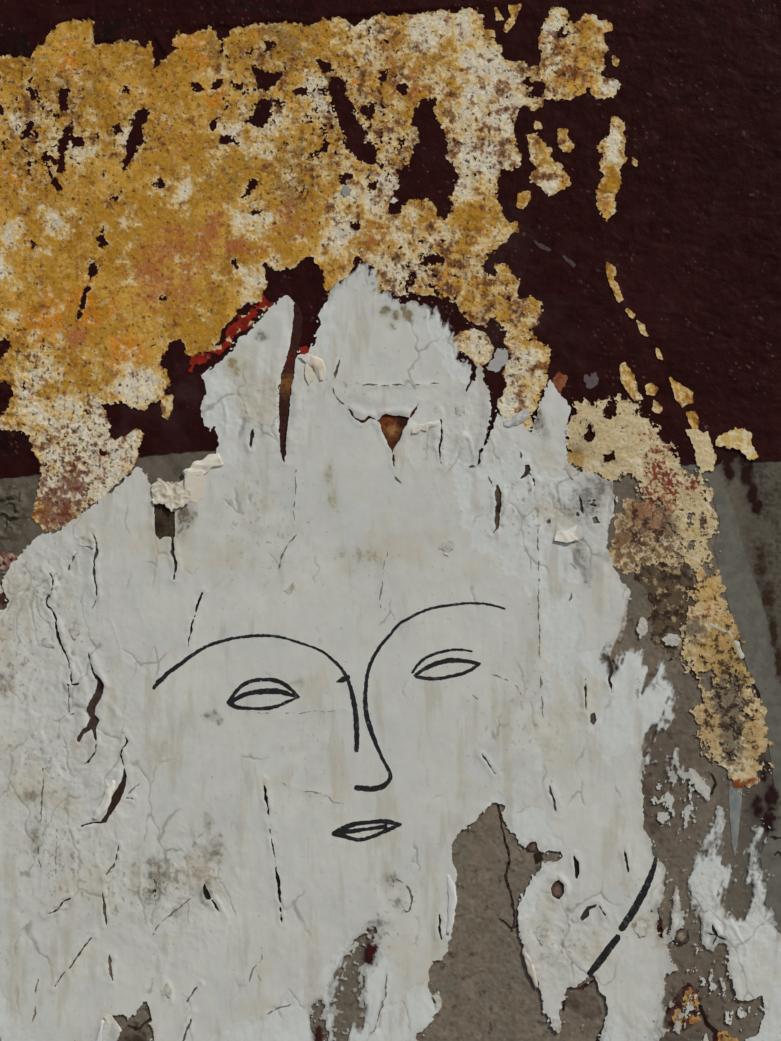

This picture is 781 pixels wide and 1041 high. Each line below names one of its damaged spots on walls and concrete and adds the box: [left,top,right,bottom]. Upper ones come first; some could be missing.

rust [552,372,568,394]
rust [715,446,763,513]
crack [46,533,99,715]
crack [84,732,128,765]
crack [151,879,220,935]
peeling [446,874,457,935]
peeling [522,948,538,988]
crack [127,1017,151,1031]
crack [182,987,197,1041]
peeling [433,991,443,1010]
peeling [550,1018,562,1033]
peeling [664,982,739,1041]